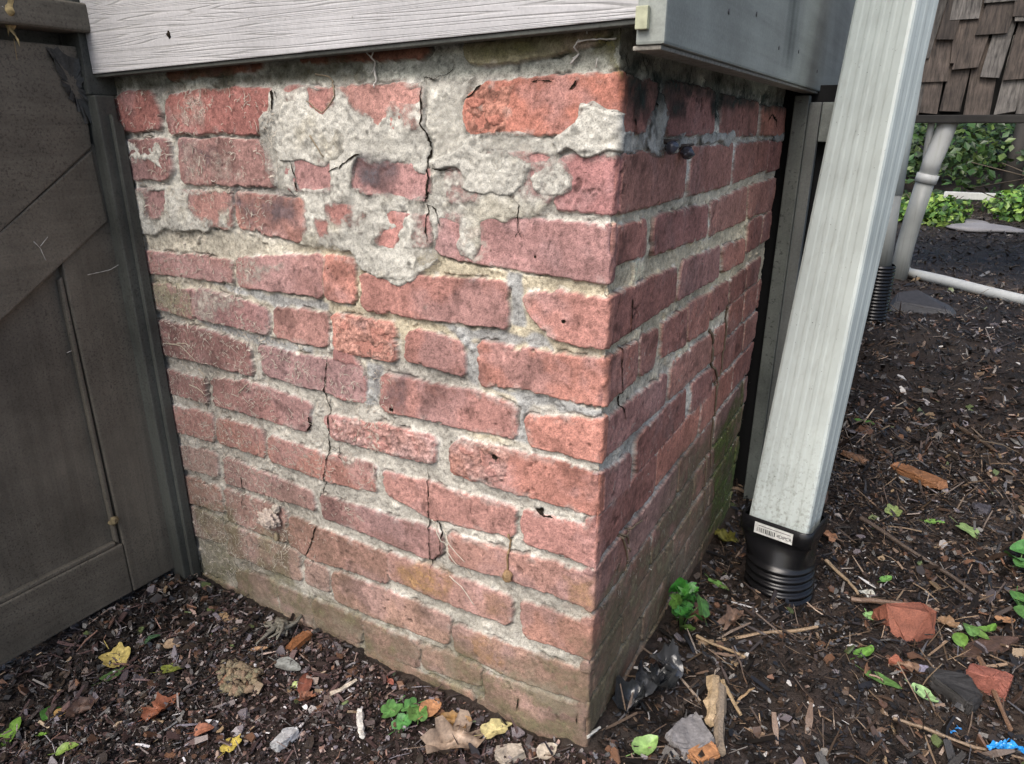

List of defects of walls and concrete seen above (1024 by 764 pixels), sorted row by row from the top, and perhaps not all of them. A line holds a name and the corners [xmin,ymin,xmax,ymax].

peeling [273,101,344,167]
crack [419,66,454,243]
peeling [431,84,571,196]
peeling [552,103,626,158]
damp [622,54,785,123]
crack [617,301,634,417]
crack [307,357,341,496]
crack [426,474,443,581]